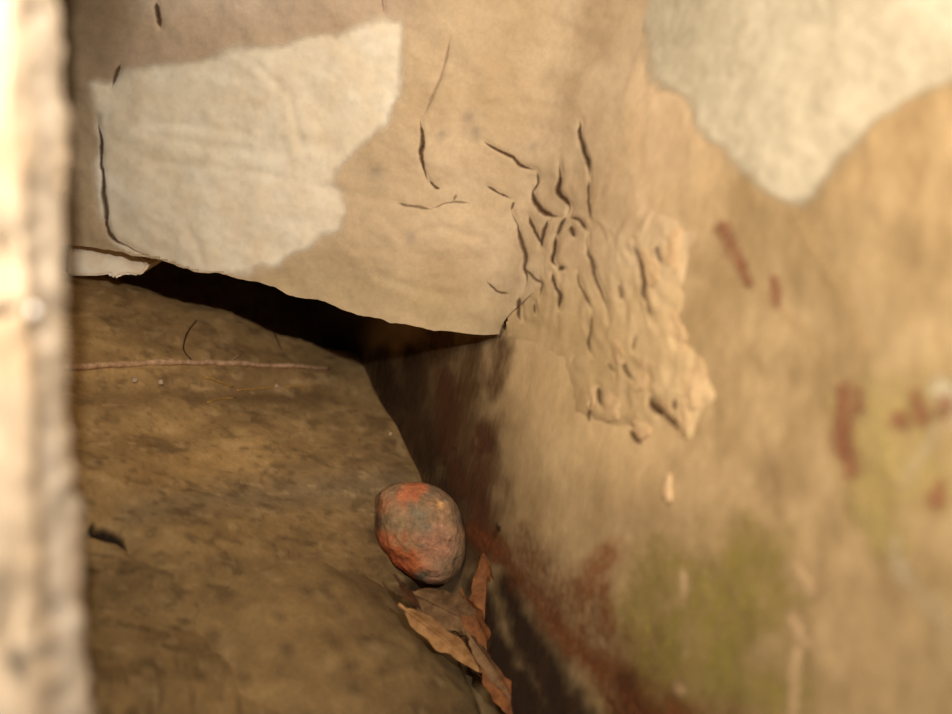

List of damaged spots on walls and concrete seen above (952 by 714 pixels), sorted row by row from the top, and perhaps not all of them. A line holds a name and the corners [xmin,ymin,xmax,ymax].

spalling [90,18,404,275]
crack [419,127,438,189]
crack [488,124,662,351]
spalling [643,0,952,204]
crack [588,388,602,420]